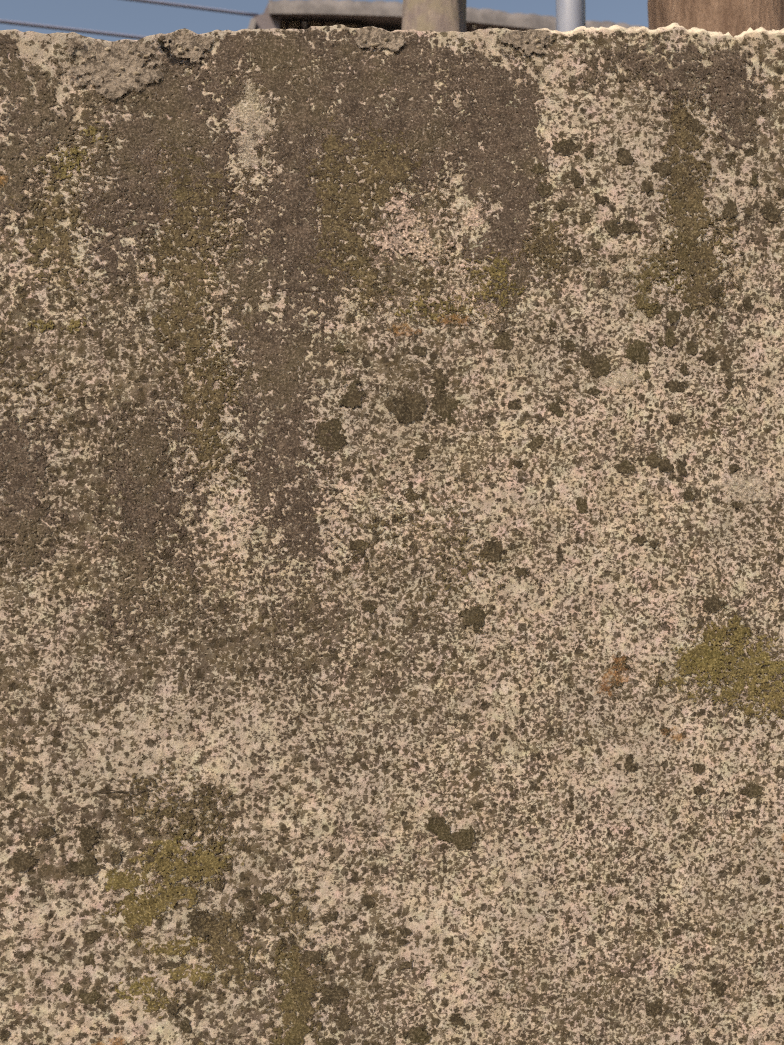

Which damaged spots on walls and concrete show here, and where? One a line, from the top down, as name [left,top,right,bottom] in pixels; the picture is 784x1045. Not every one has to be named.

water stain [0,28,572,757]